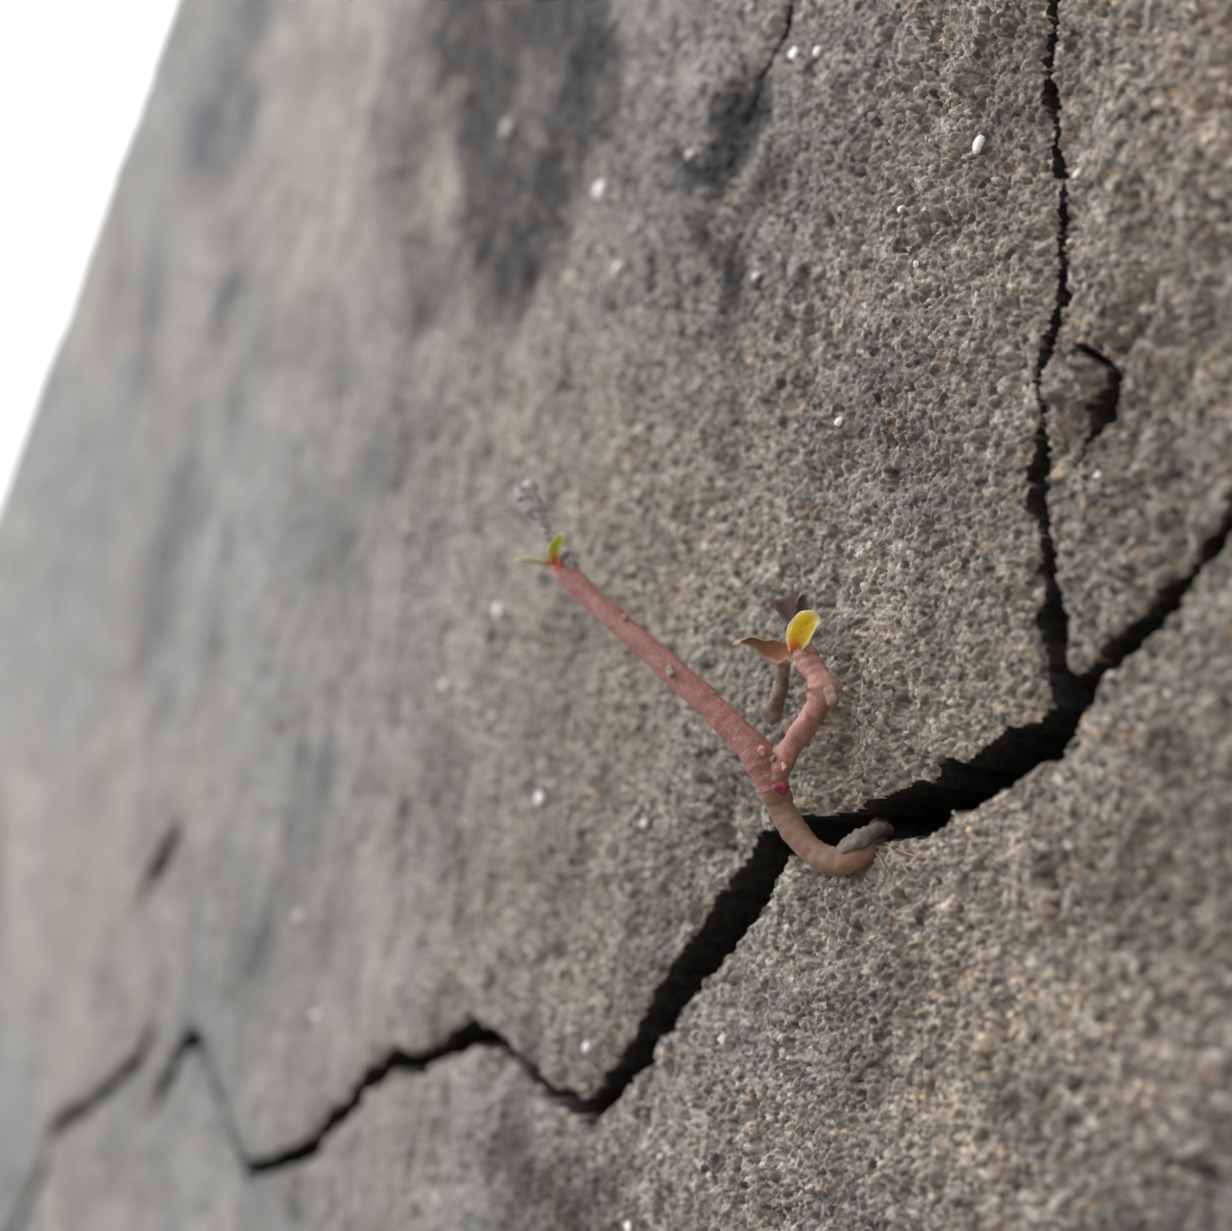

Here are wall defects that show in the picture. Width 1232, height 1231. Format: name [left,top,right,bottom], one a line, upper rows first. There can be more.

crack [759,0,796,97]
crack [802,0,1232,847]
crack [12,828,805,1231]